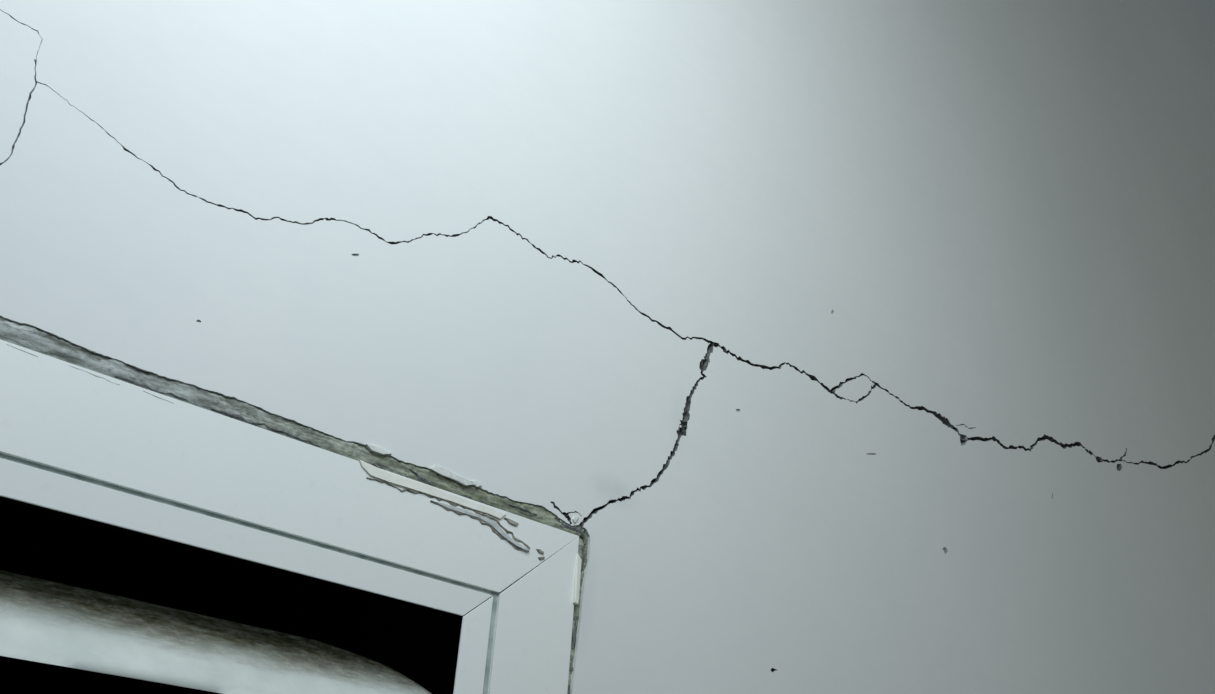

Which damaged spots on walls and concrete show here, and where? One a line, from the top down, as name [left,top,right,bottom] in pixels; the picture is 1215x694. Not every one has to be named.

crack [0,9,1215,531]
peeling [359,444,545,559]
flaking render [551,501,581,524]
peeling [573,554,582,605]